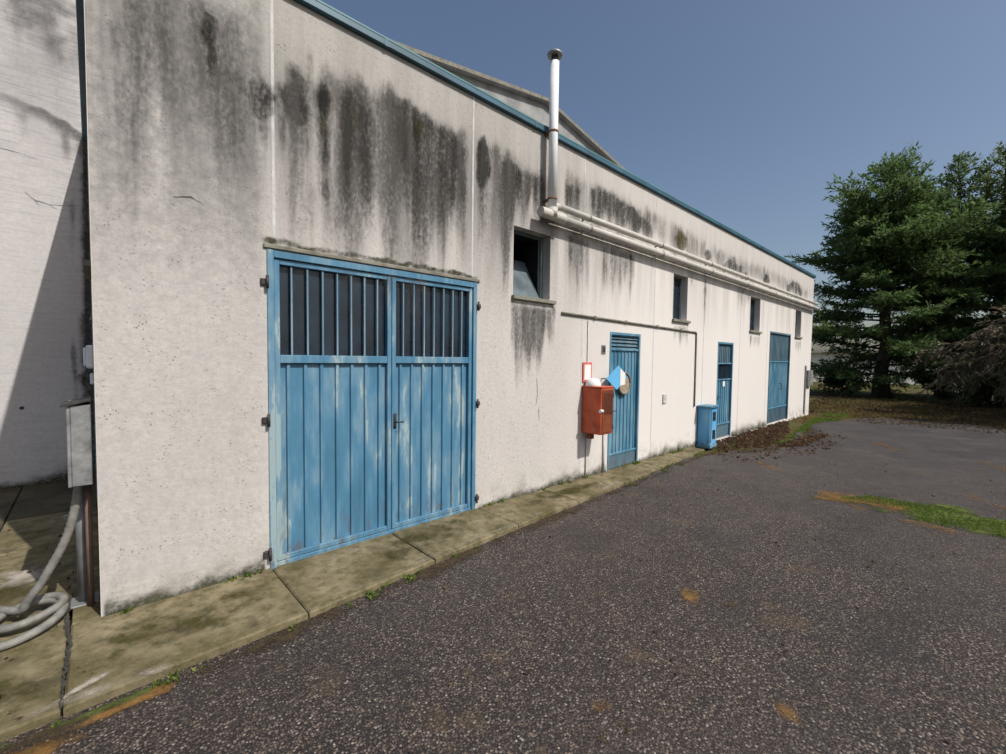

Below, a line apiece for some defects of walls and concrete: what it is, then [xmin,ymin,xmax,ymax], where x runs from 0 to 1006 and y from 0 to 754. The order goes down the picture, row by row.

leakage [201,15,216,72]
leakage [254,71,330,158]
leakage [344,91,371,191]
leakage [392,98,459,239]
leakage [477,137,491,187]
leakage [503,163,537,209]
leakage [566,186,579,206]
leakage [592,189,651,233]
leakage [30,107,97,477]
leakage [515,307,555,360]